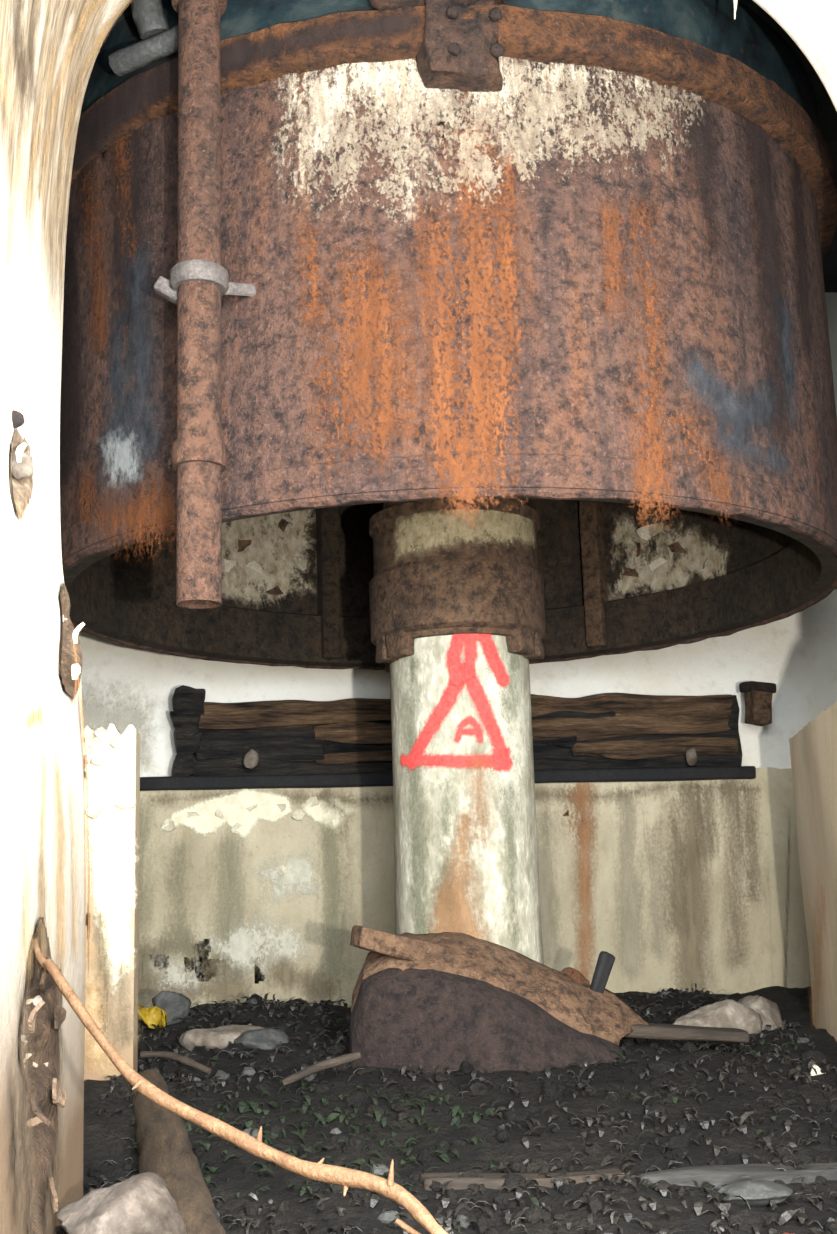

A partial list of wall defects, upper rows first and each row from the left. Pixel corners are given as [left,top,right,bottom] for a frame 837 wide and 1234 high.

damp [457,56,654,157]
spalling [8,410,36,520]
corrosion [73,465,176,546]
corrosion [301,114,522,511]
corrosion [602,207,730,513]
spalling [58,581,85,699]
damp [96,829,345,1060]
damp [408,728,426,934]
corrosion [351,759,650,1046]
damp [505,787,517,913]
damp [535,779,759,992]
spalling [18,917,67,1234]